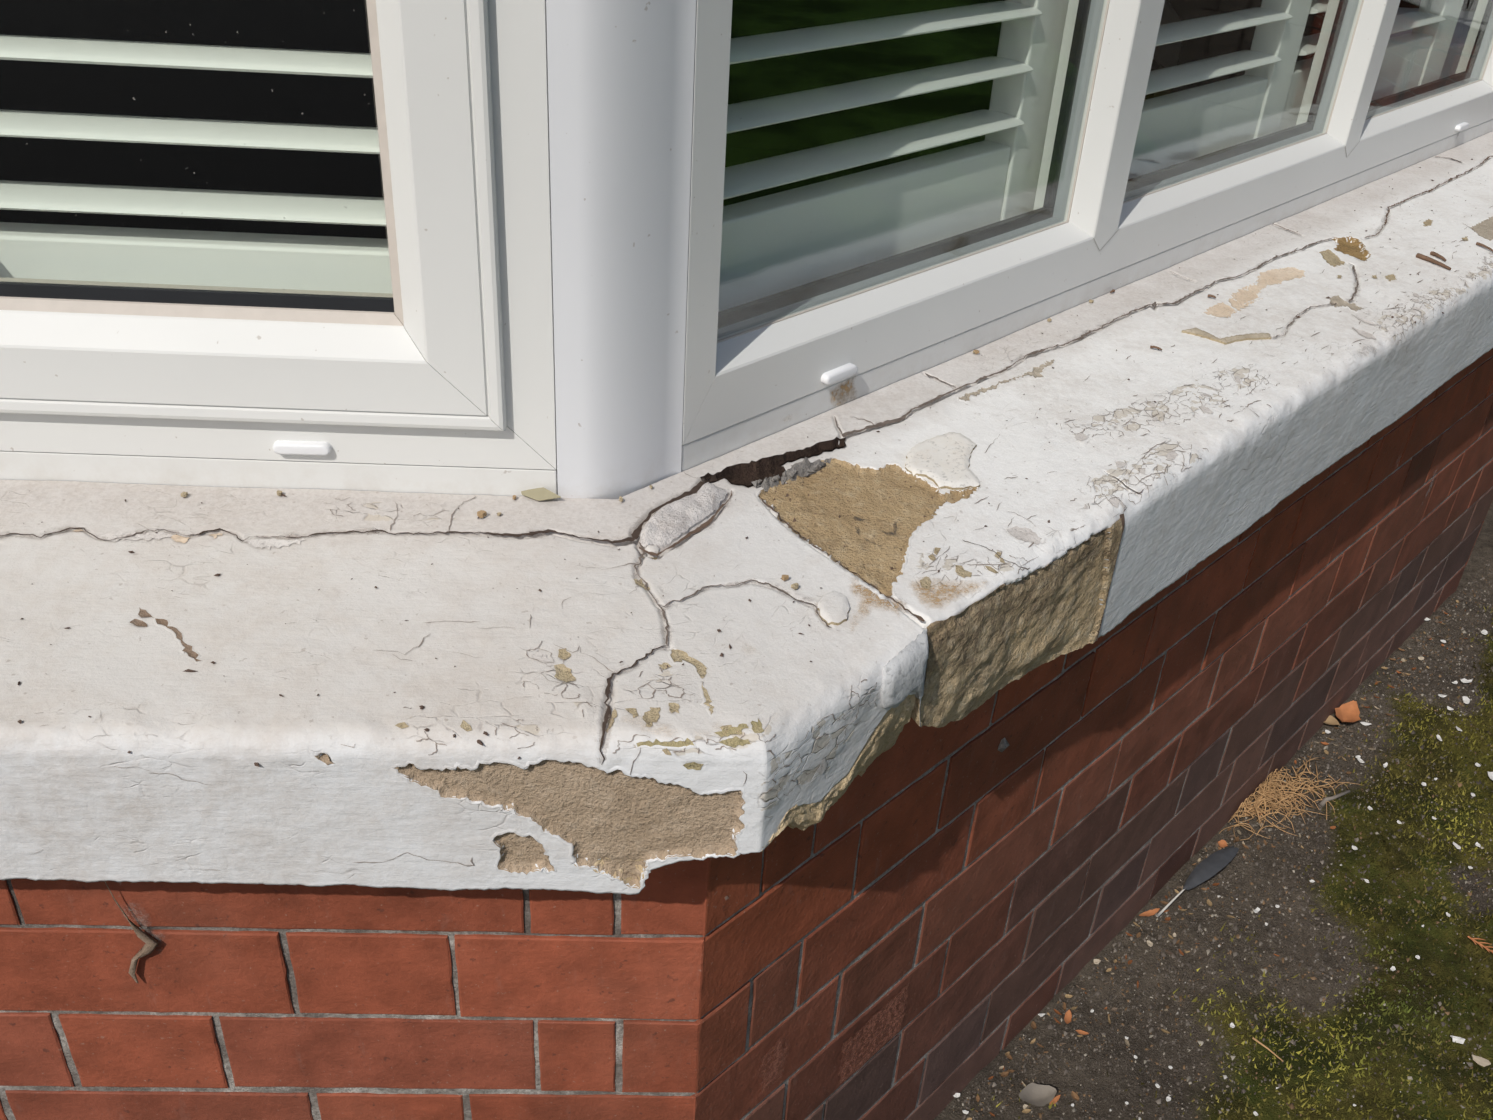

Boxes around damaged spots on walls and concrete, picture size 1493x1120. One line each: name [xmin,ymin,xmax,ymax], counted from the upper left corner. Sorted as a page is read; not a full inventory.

flaking render [1462,215,1493,242]
peeling [1182,267,1306,345]
spalling [1318,236,1398,340]
crack [0,156,1493,818]
flaking render [756,432,981,602]
peeling [554,648,576,682]
peeling [658,647,764,748]
spalling [762,514,1125,851]
flaking render [391,703,748,890]